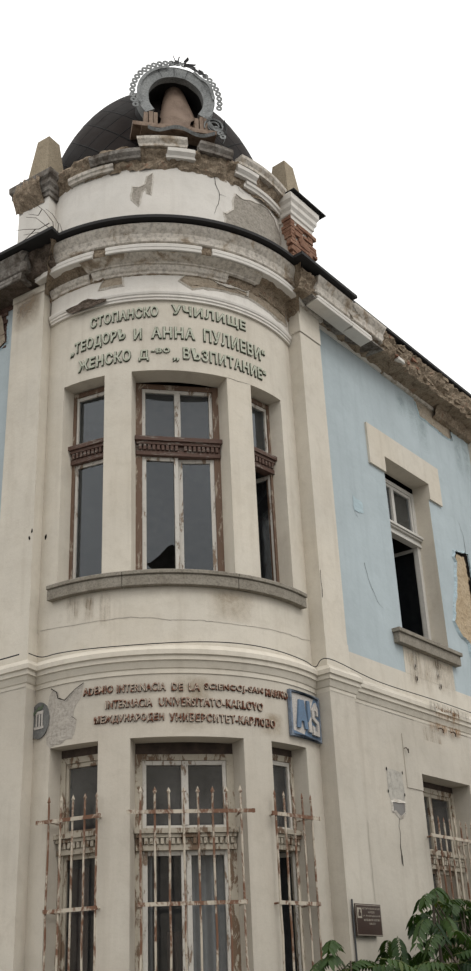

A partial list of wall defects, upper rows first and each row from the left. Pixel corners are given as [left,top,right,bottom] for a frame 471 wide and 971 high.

peeling [130,173,154,207]
flaking render [223,193,318,262]
flaking render [0,302,29,351]
flaking render [413,399,452,441]
flaking render [451,549,471,659]
flaking render [46,683,84,748]
flaking render [391,799,406,819]